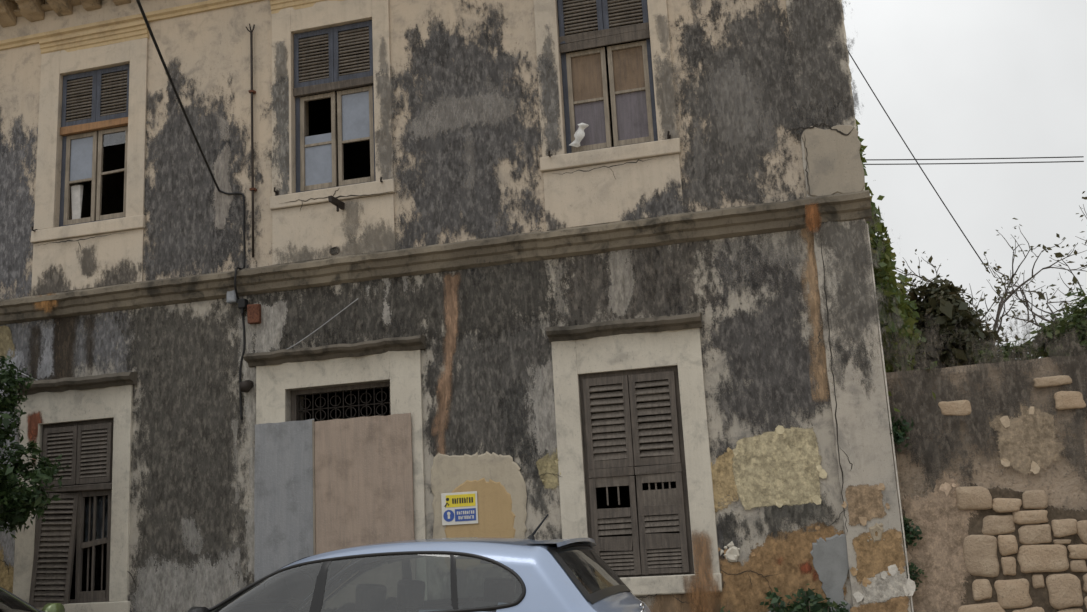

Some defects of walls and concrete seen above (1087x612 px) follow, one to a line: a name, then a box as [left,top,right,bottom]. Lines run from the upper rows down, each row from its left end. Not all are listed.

mould [0,0,566,299]
crack [552,159,651,179]
leakage [622,0,863,221]
spalling [838,0,857,130]
rust [431,273,460,454]
leakage [0,209,1087,612]
flaking render [718,541,755,562]
peeling [711,425,827,512]
rust [801,204,830,400]
crack [818,246,852,536]
spalling [843,466,1087,612]
peeling [989,405,1065,475]